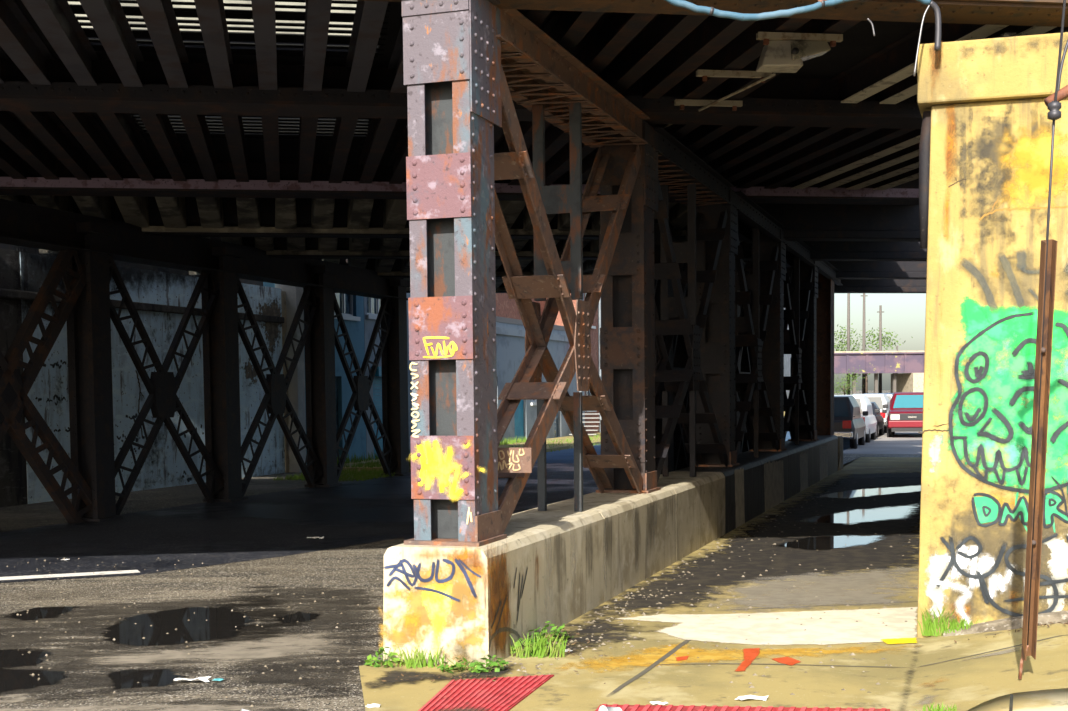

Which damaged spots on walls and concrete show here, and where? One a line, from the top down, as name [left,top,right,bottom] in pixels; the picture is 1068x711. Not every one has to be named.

water stain [954,121,1015,236]
water stain [734,468,745,528]
water stain [764,460,784,512]